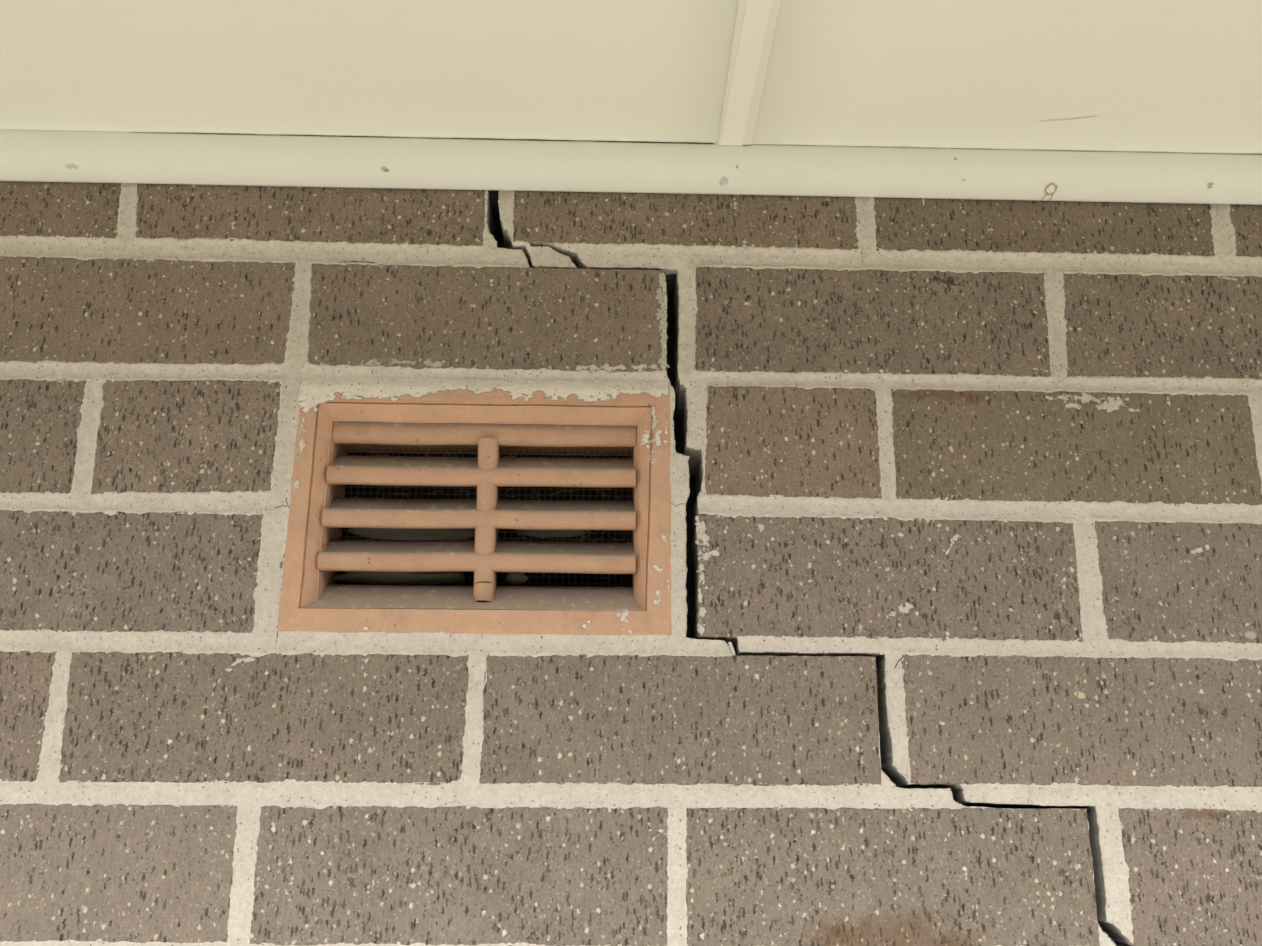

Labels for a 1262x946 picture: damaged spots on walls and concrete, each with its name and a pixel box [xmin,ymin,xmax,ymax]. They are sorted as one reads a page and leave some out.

crack [487,192,1132,946]